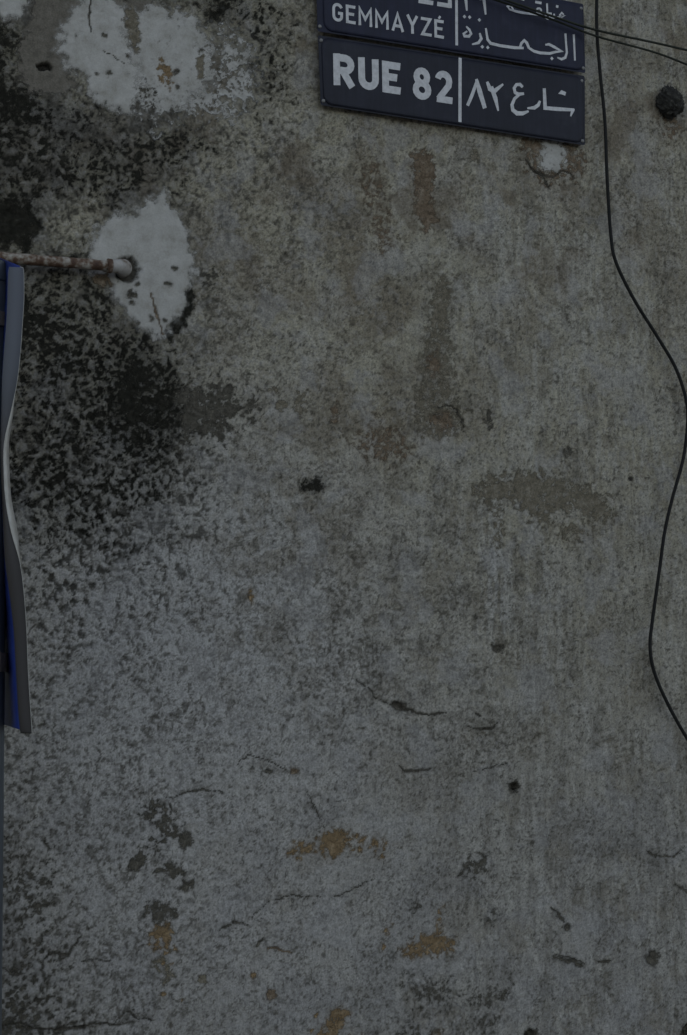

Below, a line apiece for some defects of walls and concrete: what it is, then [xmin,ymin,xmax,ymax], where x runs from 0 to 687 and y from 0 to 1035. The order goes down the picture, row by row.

flaking render [16,0,81,94]
water stain [0,0,308,553]
crack [351,678,446,716]
crack [469,712,497,730]
rust [286,829,388,861]
rust [142,900,180,997]
rust [381,905,455,960]
crack [2,936,151,1035]
rust [310,1008,351,1035]